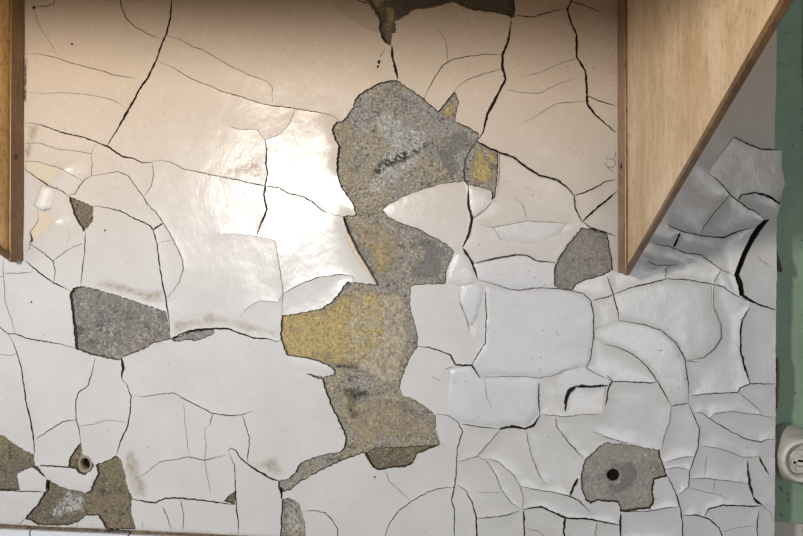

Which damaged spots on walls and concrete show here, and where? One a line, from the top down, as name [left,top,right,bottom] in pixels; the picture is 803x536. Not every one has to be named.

spalling [334,0,515,68]
peeling [26,162,94,260]
spalling [70,286,215,360]
crack [25,0,354,342]
spalling [278,80,499,536]
crack [385,0,780,536]
spalling [554,227,613,290]
crack [0,233,283,530]
spalling [0,435,136,530]
spalling [581,442,667,512]